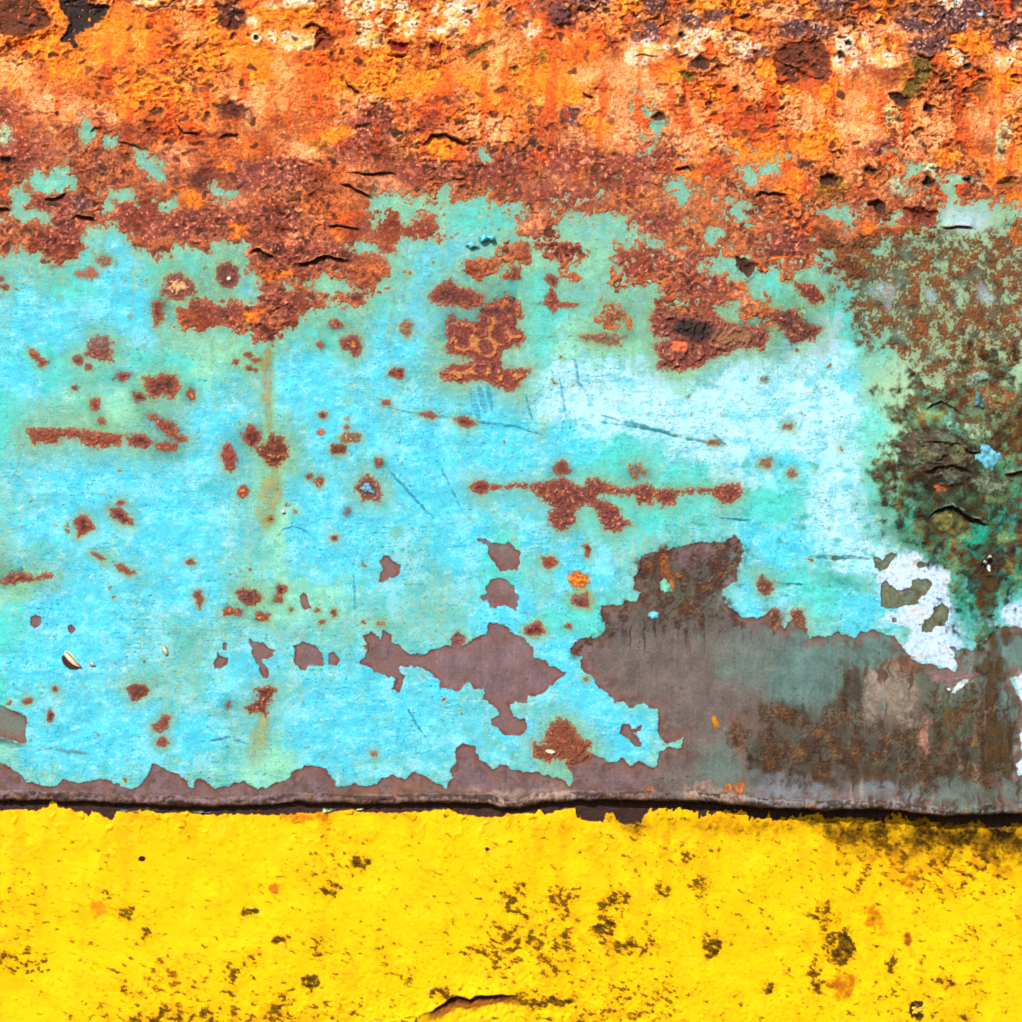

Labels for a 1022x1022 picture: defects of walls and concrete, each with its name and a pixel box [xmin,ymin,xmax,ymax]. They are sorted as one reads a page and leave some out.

corrosion [0,0,1022,455]
corrosion [469,459,743,533]
corrosion [0,568,55,586]
corrosion [126,684,150,702]
corrosion [150,713,173,748]
corrosion [244,685,277,744]
peeling [0,535,1022,811]
corrosion [530,716,595,770]
corrosion [711,669,1015,795]
corrosion [0,781,1022,829]
crack [430,995,515,1019]